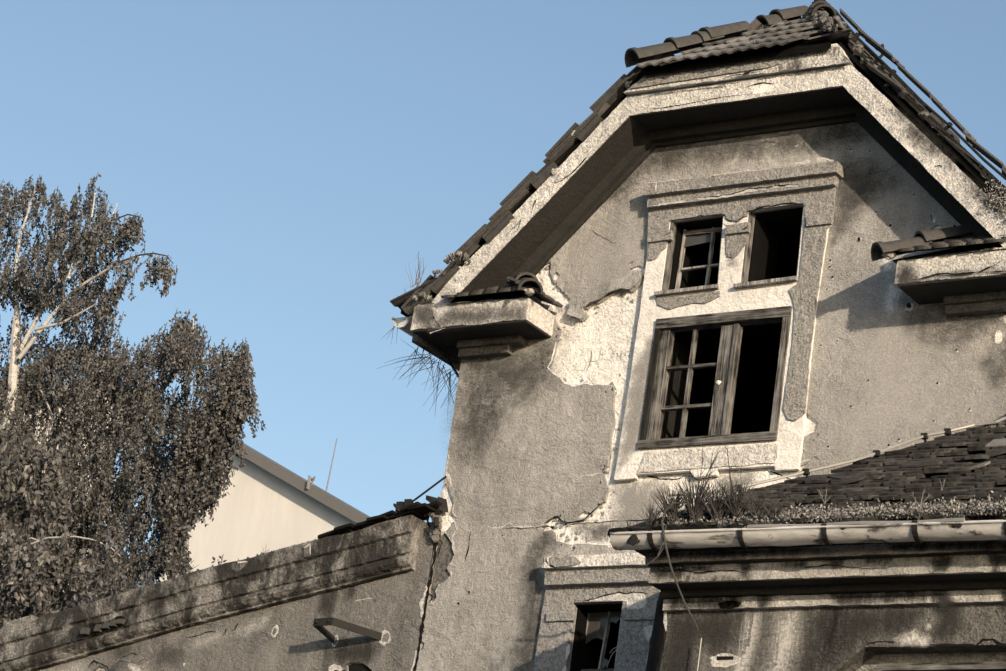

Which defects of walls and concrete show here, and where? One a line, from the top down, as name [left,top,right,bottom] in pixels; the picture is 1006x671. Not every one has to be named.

peeling [523,262,820,550]
crack [411,516,442,671]
crack [465,519,649,562]
crack [661,612,669,631]